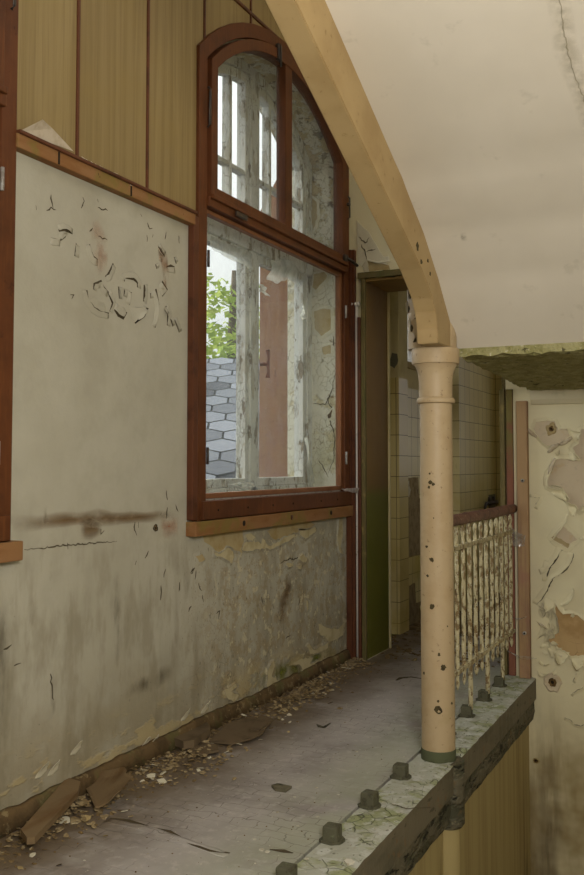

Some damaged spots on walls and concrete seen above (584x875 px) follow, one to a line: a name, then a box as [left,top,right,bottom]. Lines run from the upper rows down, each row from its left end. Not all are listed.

crack [559,0,584,102]
peeling [50,223,73,246]
peeling [83,242,182,332]
peeling [528,417,584,552]
crack [24,522,149,564]
damp [48,515,153,533]
peeling [408,473,435,563]
crack [160,568,224,619]
spalling [288,621,344,671]
peeling [536,588,584,693]
spalling [264,659,279,688]